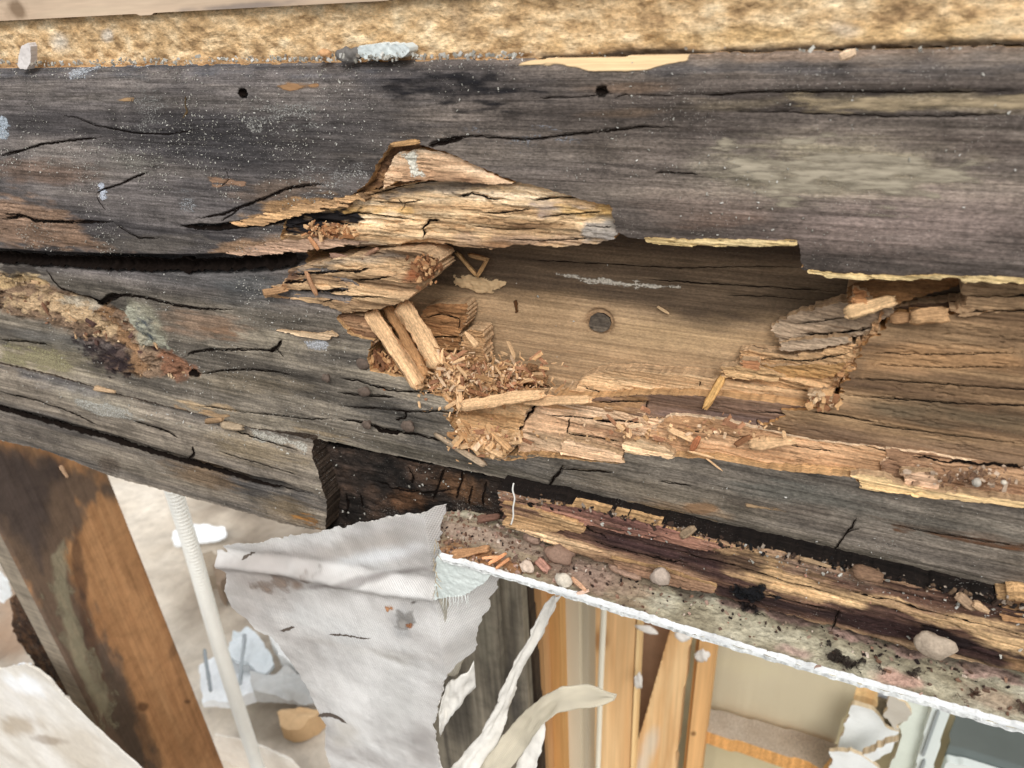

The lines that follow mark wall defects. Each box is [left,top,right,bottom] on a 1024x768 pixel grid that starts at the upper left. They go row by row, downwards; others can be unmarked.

crack [2,116,188,156]
crack [428,126,677,146]
crack [182,181,438,237]
crack [0,172,395,311]
leakage [1,264,47,278]
leakage [71,336,135,378]
crack [185,340,292,377]
crack [586,518,1021,634]
leakage [729,583,782,616]
leakage [921,625,977,648]
leakage [820,640,887,675]